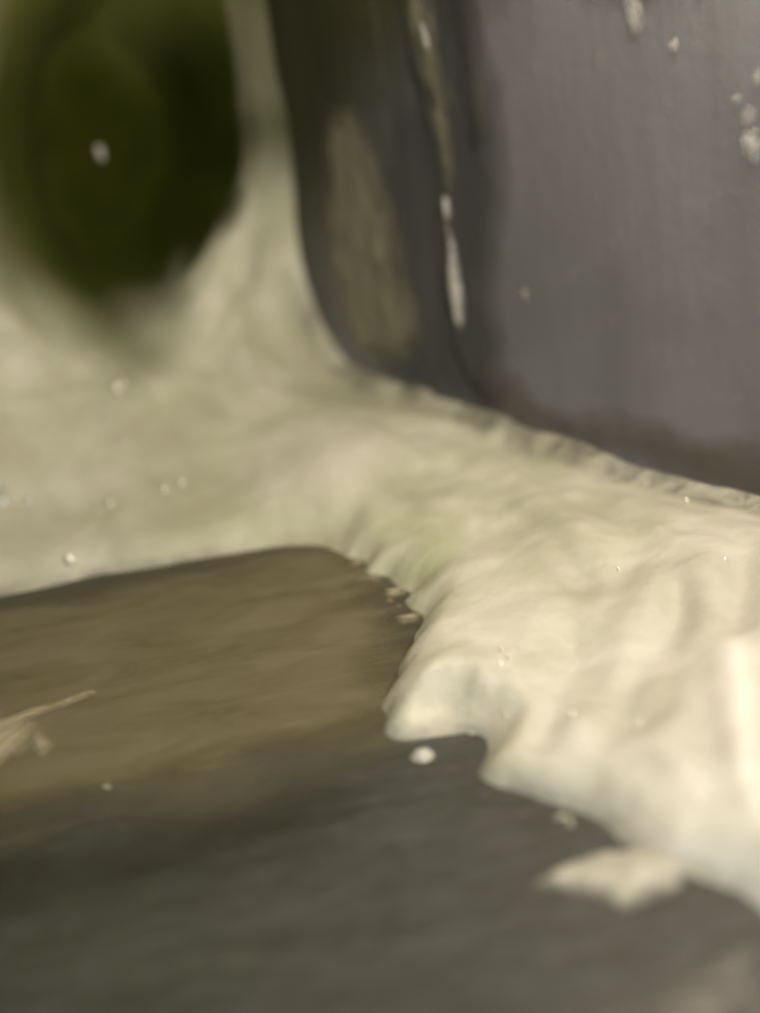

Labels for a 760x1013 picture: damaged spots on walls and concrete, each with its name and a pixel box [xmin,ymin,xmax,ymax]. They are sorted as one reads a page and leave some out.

water stain [0,0,760,531]
water stain [0,394,760,906]